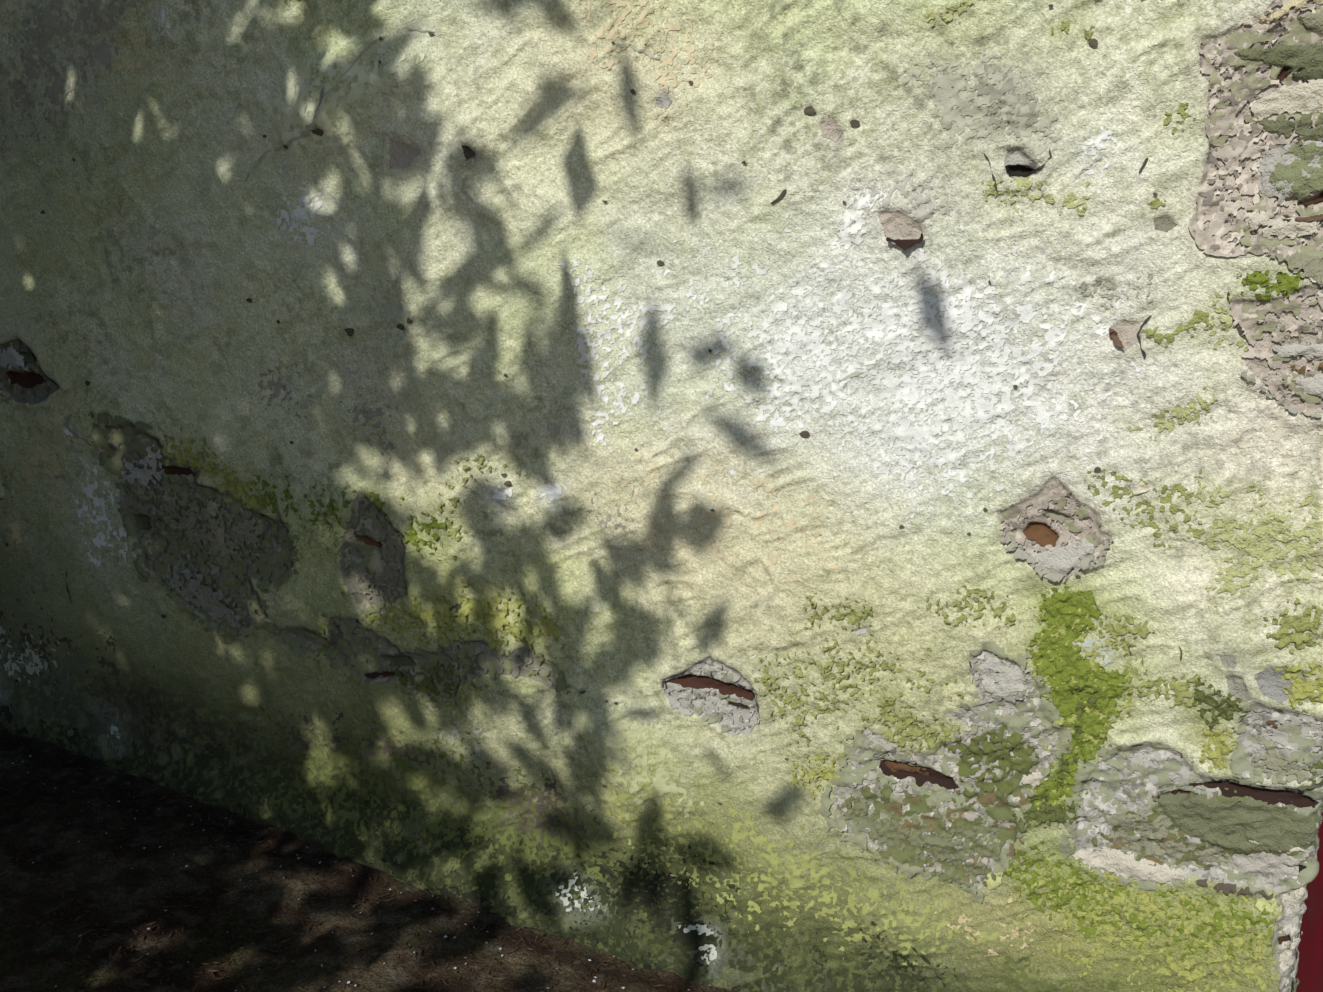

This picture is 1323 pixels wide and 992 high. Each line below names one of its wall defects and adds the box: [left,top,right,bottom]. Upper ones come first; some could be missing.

spalling [1154,0,1323,418]
spalling [0,339,59,404]
leakage [0,406,137,569]
spalling [88,411,571,703]
leakage [492,485,512,500]
spalling [996,476,1114,582]
leakage [0,626,70,686]
leakage [276,700,491,769]
spalling [661,656,760,736]
leakage [1075,633,1115,665]
spalling [819,642,1323,992]
leakage [235,777,959,992]